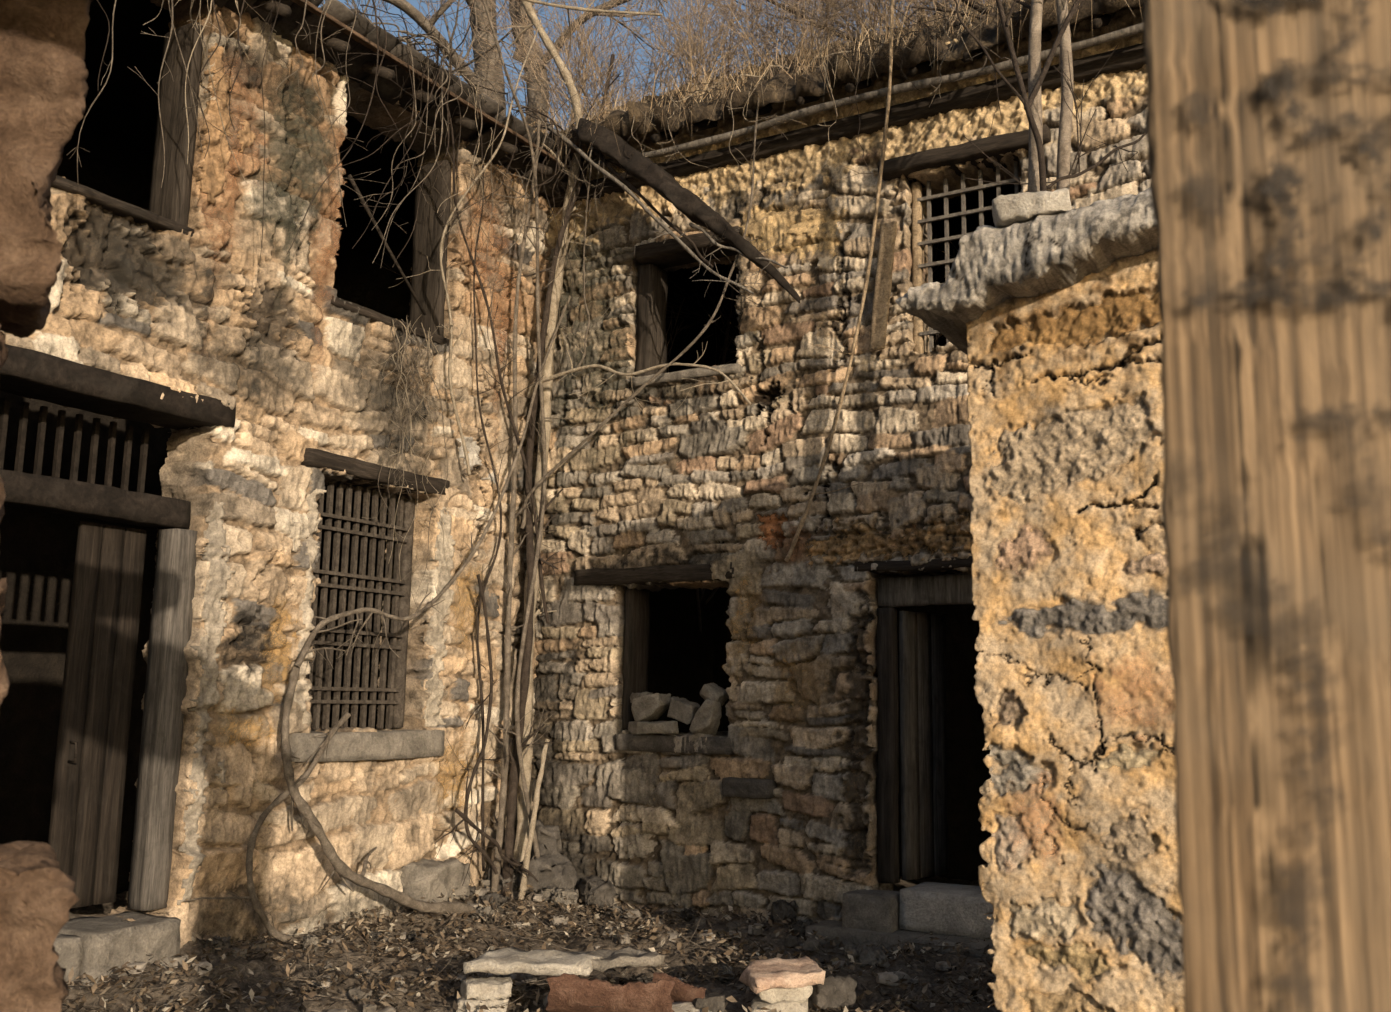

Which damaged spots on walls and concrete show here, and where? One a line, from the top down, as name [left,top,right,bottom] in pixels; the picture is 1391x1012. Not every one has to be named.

crack [1076,481,1163,541]
spalling [1126,553,1167,574]
spalling [998,589,1168,638]
crack [981,638,1174,864]
spalling [1009,808,1183,1012]